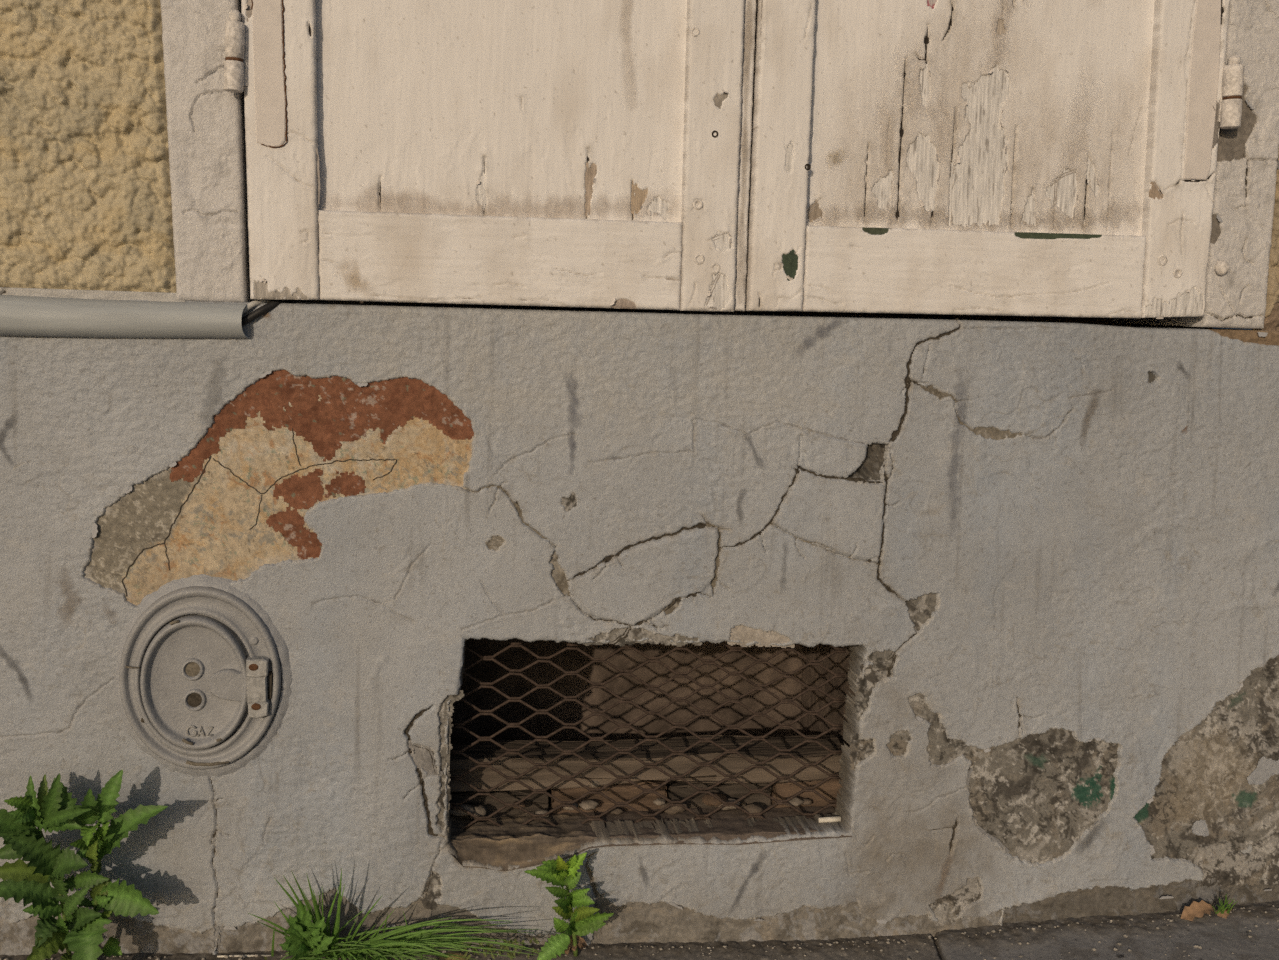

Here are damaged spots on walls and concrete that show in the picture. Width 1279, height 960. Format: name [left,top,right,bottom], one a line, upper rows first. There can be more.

peeling [862,227,892,235]
peeling [1015,158,1102,239]
flaking render [84,370,474,606]
crack [467,287,1058,645]
crack [887,633,917,677]
crack [210,779,223,947]
peeling [79,869,569,955]
crack [392,705,440,896]
flaking render [408,690,464,838]
crack [580,852,602,936]
flaking render [591,649,1279,944]
crack [906,769,1010,853]